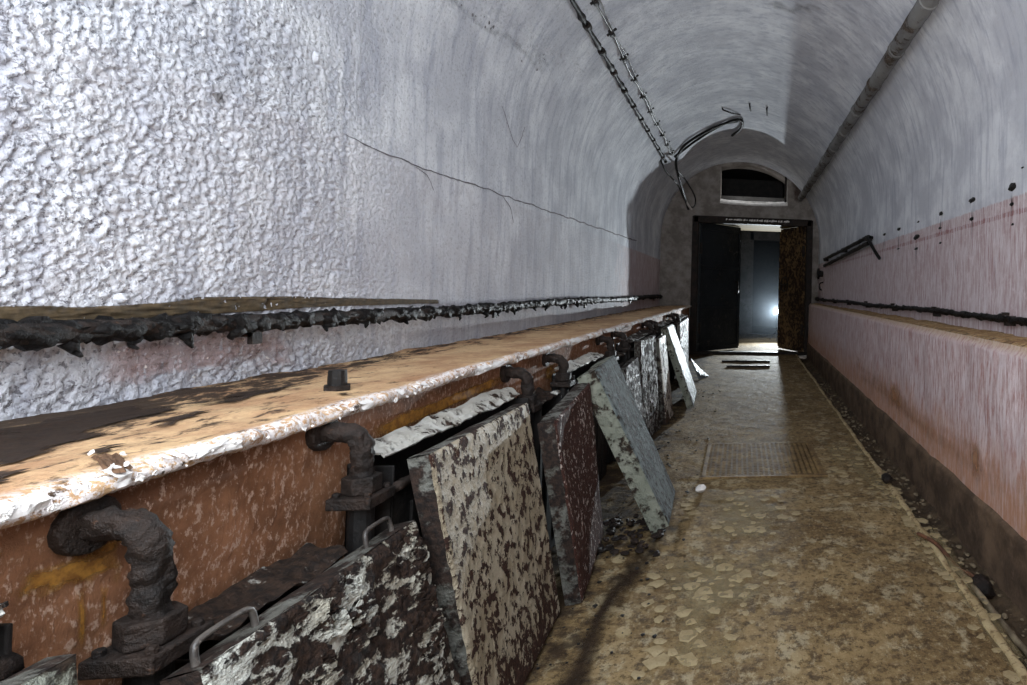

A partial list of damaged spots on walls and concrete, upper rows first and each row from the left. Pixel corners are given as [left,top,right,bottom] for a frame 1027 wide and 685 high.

crack [346,134,637,241]
peeling [456,306,690,378]
peeling [327,398,374,419]
peeling [394,379,437,403]
peeling [160,421,314,467]
spalling [87,449,158,488]
peeling [0,475,92,523]
rust [21,541,119,594]